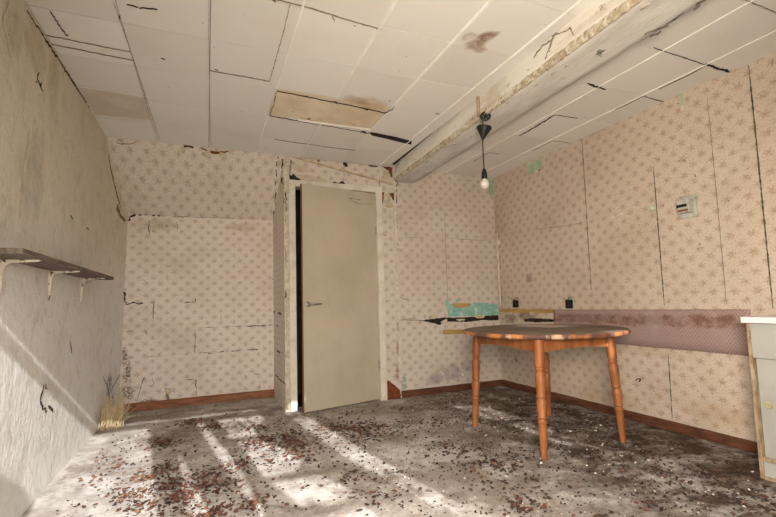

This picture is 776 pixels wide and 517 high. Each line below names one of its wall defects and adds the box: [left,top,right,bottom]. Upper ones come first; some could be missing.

crack [27,10,133,108]
crack [533,27,575,60]
spalling [369,0,650,182]
peeling [180,145,228,158]
crack [108,140,235,232]
crack [124,291,154,334]
peeling [428,298,499,324]